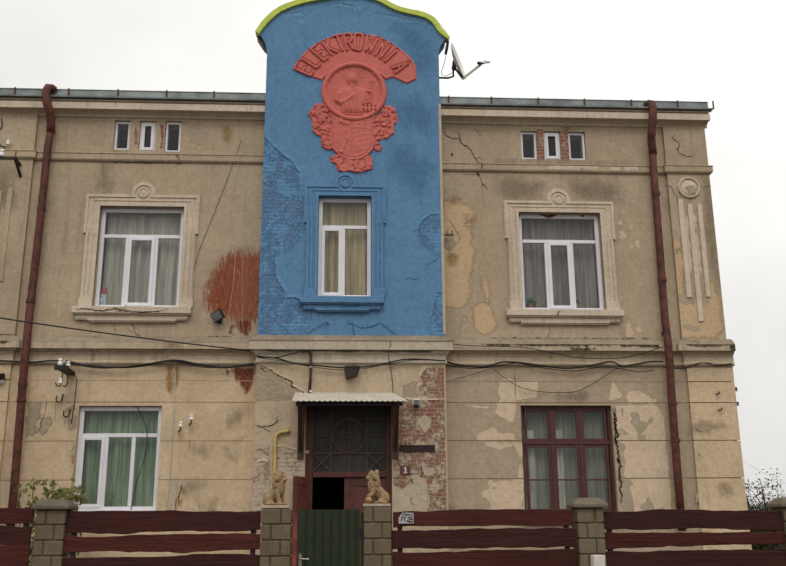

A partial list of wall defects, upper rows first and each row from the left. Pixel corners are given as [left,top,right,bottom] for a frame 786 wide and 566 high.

crack [442,130,488,189]
crack [670,133,696,159]
rust [203,251,260,336]
flaking render [258,135,312,334]
crack [341,301,395,347]
peeling [414,197,497,335]
rust [226,367,254,393]
flaking render [393,365,447,512]
peeling [476,427,524,510]
peeling [466,377,539,423]
crack [613,408,623,502]
peeling [608,382,671,512]